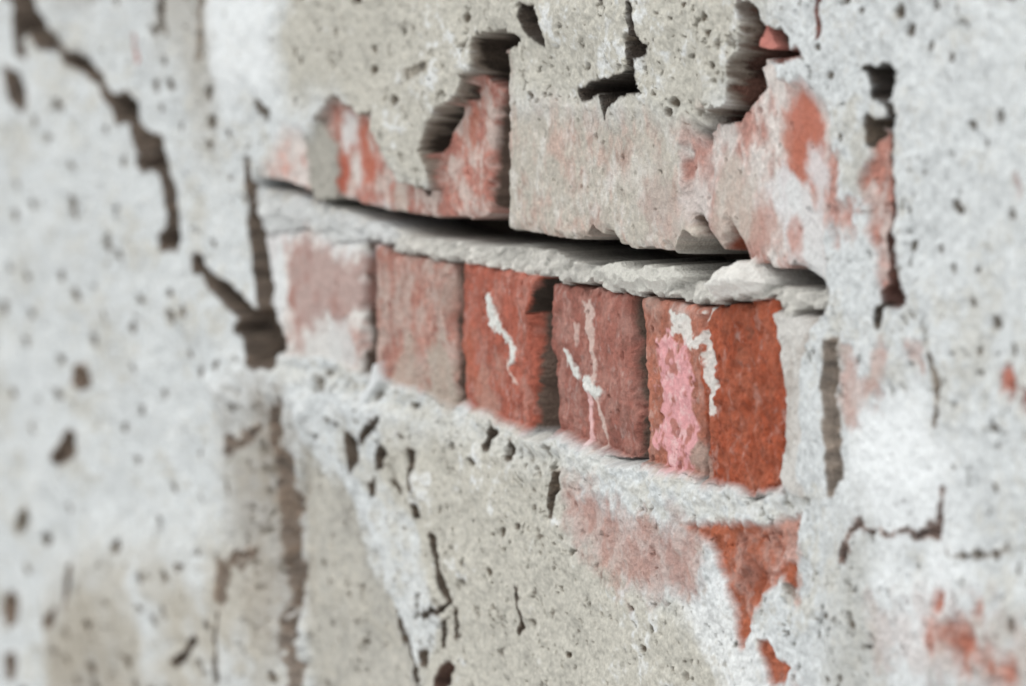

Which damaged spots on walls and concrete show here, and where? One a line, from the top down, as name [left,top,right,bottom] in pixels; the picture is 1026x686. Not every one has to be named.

crack [3,0,288,371]
spalling [253,0,907,686]
crack [170,398,310,686]
crack [343,416,461,686]
crack [838,484,1010,565]